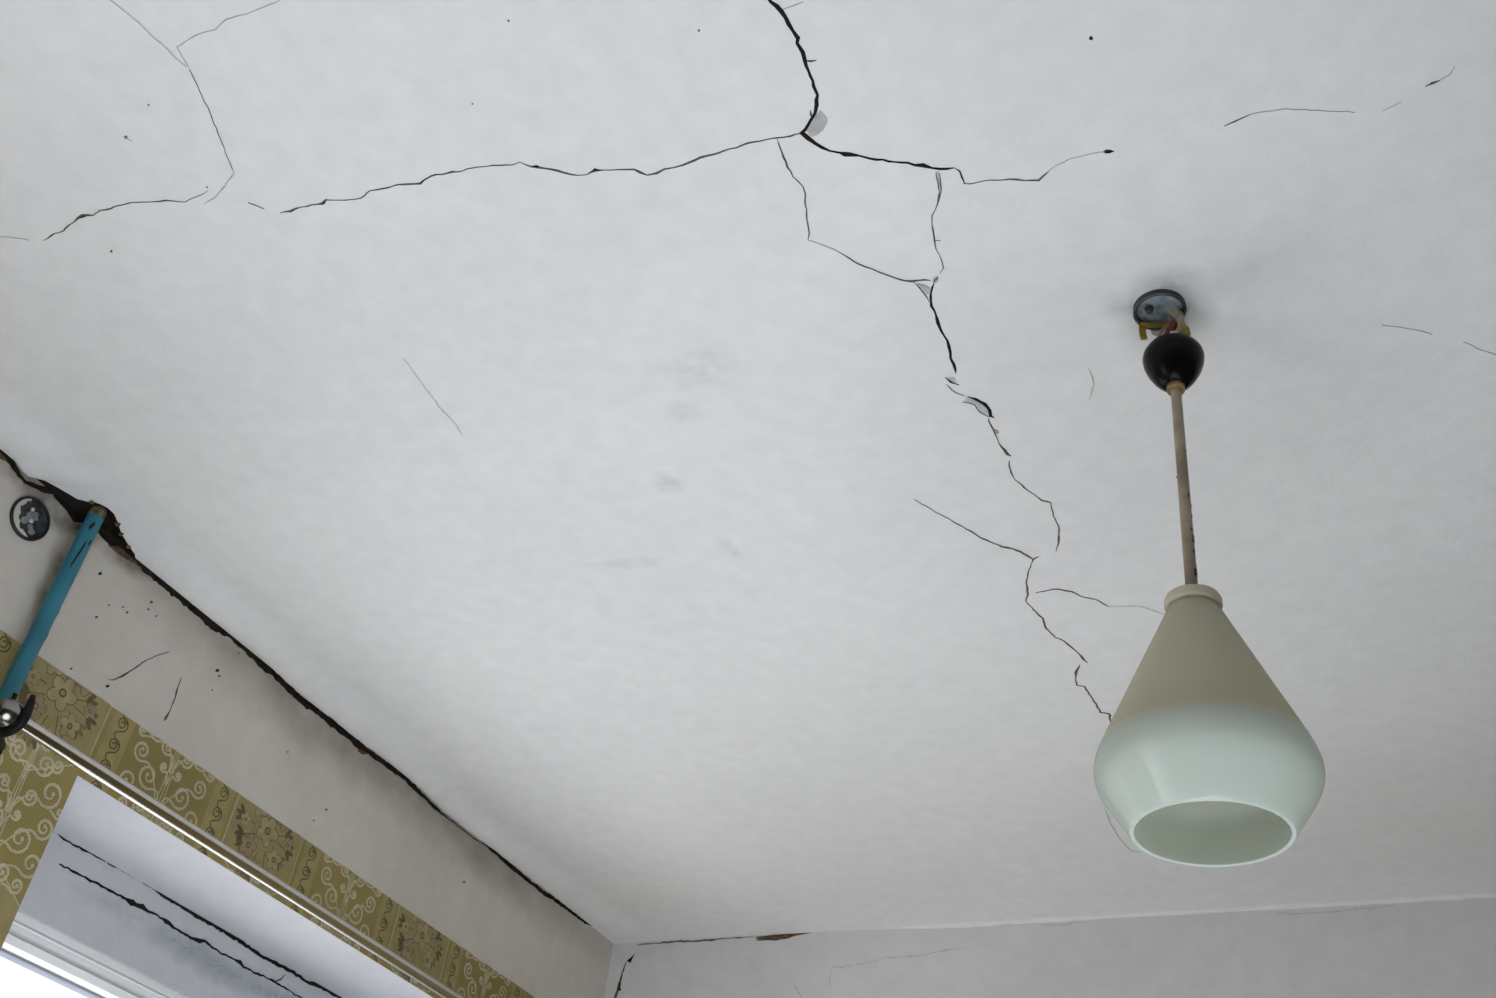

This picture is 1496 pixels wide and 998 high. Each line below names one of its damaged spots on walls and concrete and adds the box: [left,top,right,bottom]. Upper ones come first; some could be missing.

crack [1225,67,1455,126]
crack [0,0,1165,722]
crack [0,449,591,926]
crack [58,834,342,998]
crack [614,933,808,998]
crack [1276,904,1398,915]